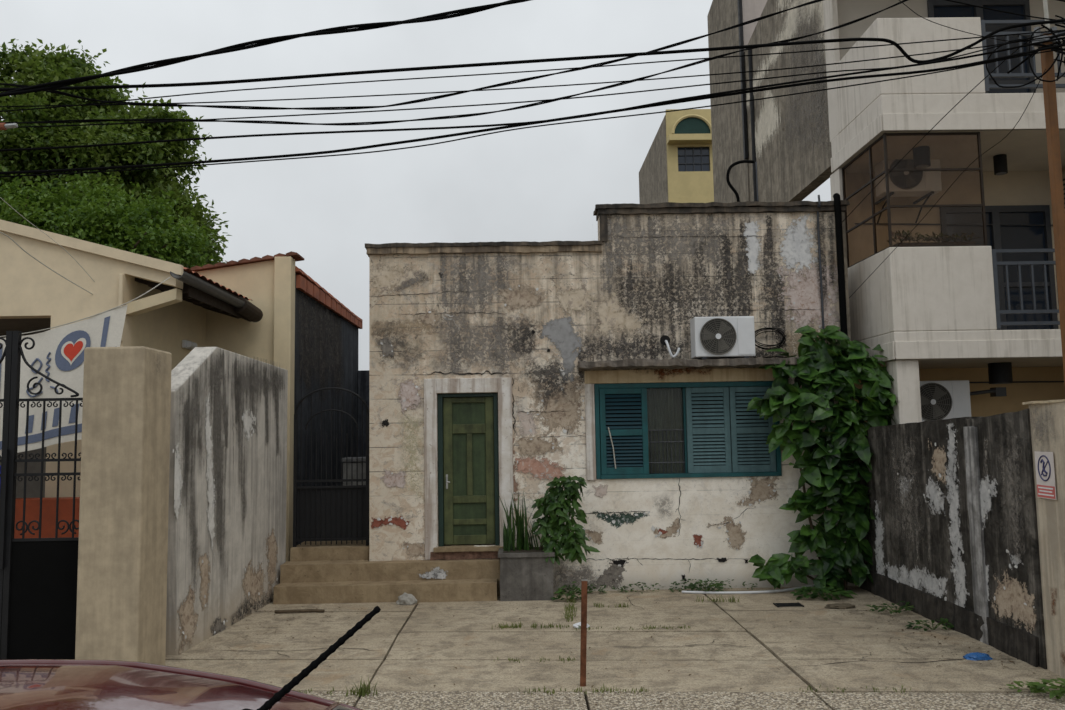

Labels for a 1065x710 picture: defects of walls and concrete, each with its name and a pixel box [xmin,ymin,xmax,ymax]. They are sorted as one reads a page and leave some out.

leakage [296,289,344,400]
leakage [372,214,818,403]
leakage [182,354,285,564]
leakage [232,594,274,625]
peeling [371,516,425,559]
peeling [419,566,448,579]
peeling [583,510,681,545]
peeling [693,476,779,563]
peeling [874,422,970,608]
peeling [979,475,998,530]
peeling [985,549,1044,634]